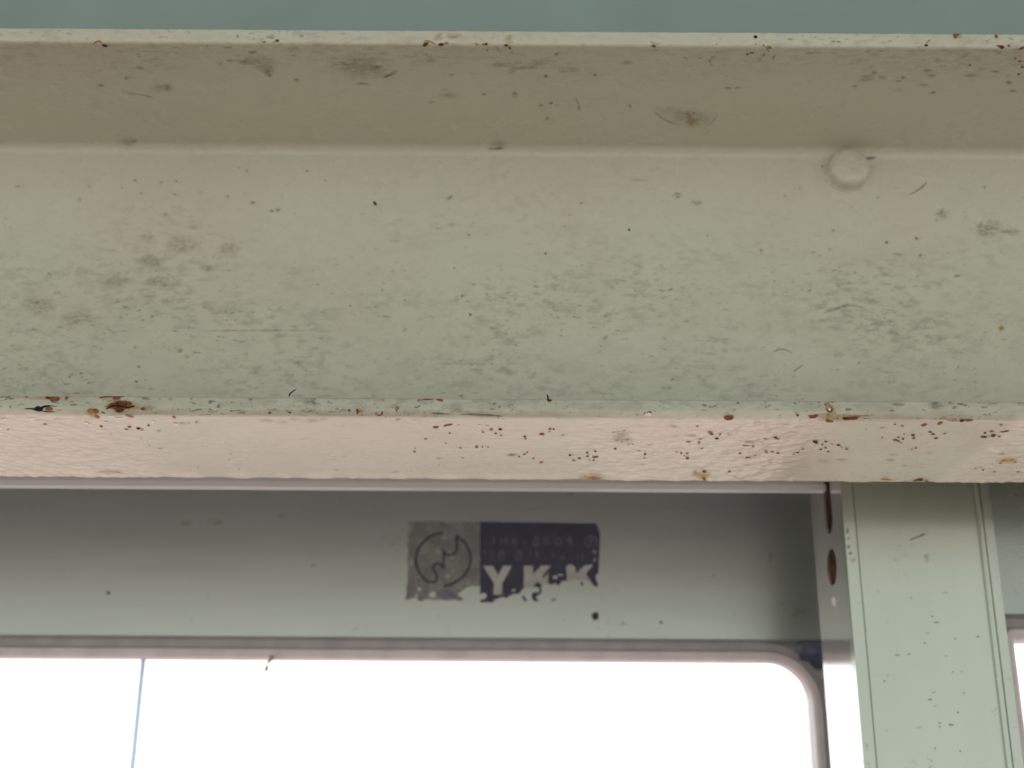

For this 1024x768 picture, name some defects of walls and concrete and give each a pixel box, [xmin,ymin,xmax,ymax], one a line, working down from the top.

corrosion [88,396,149,419]
corrosion [796,402,869,423]